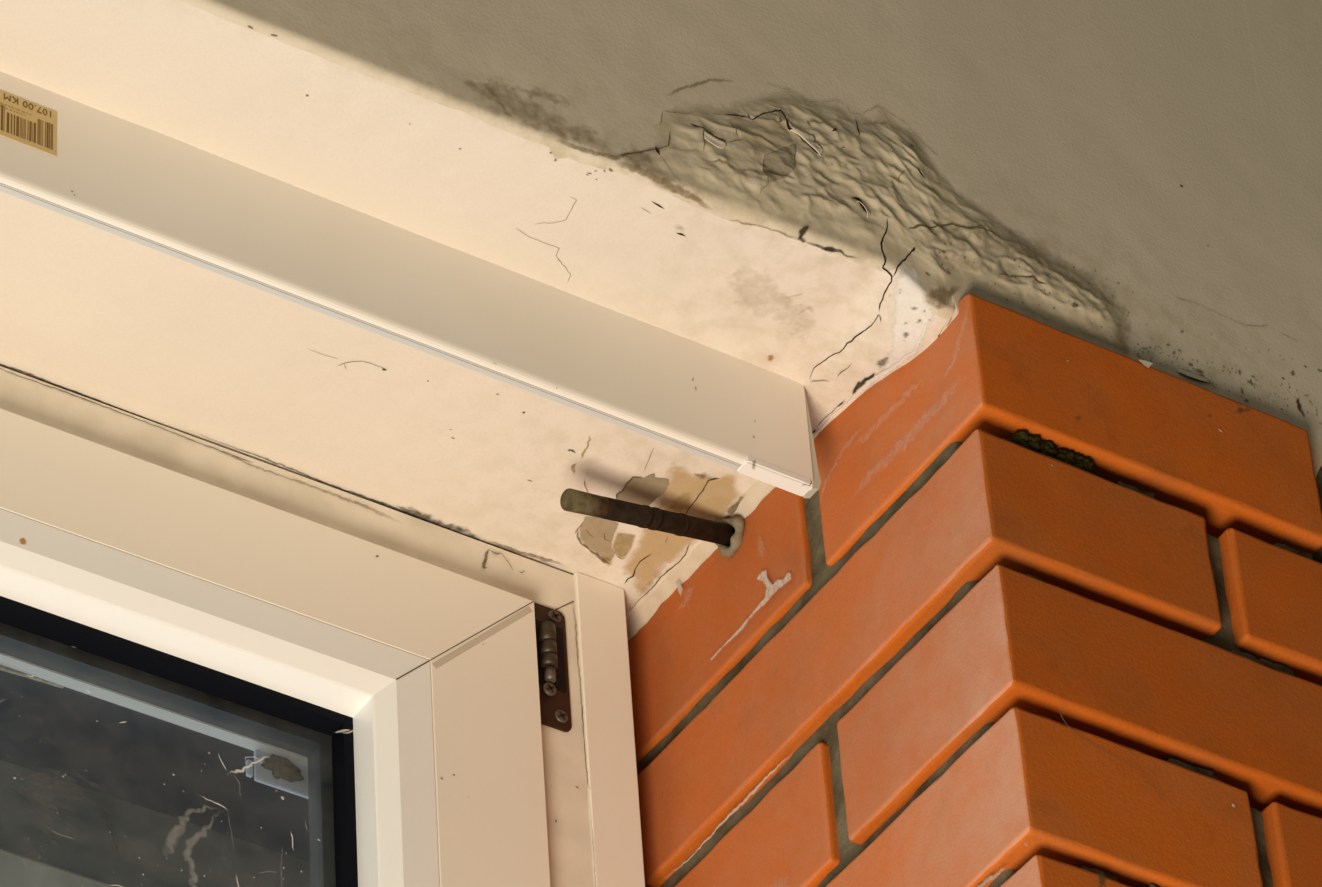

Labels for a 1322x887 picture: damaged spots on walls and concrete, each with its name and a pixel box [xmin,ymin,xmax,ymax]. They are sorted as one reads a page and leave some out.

water stain [572,145,701,202]
spalling [728,113,796,183]
water stain [741,223,851,257]
crack [809,197,999,382]
crack [1002,274,1045,284]
water stain [813,242,974,437]
water stain [1126,338,1322,424]
spalling [616,474,669,506]
spalling [577,517,634,564]